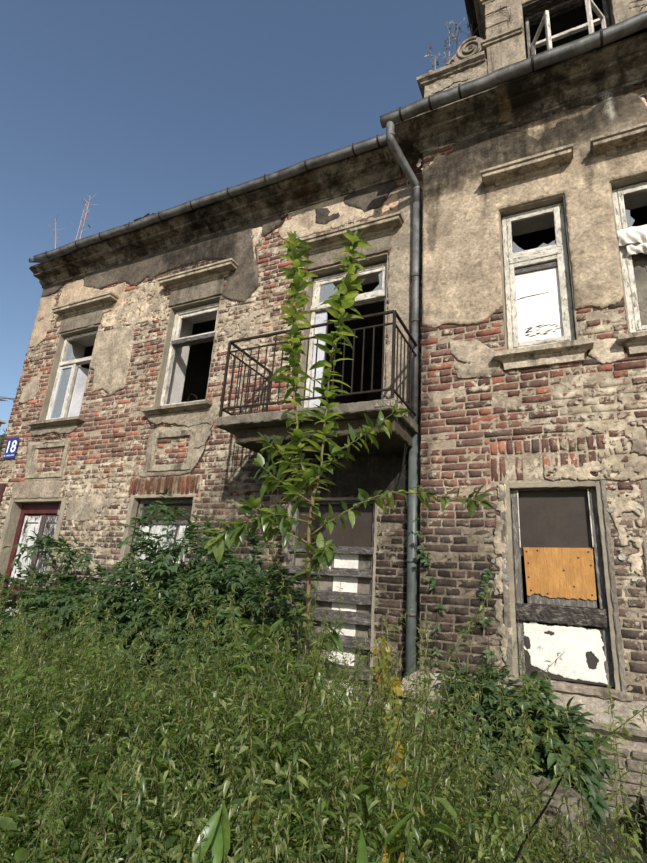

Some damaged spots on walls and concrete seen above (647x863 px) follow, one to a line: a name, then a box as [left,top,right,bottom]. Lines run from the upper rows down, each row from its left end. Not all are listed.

damp [425,90,627,196]
peeling [274,194,402,240]
peeling [251,227,262,262]
peeling [100,278,167,328]
crack [147,418,214,471]
peeling [605,484,645,581]
peeling [491,484,513,662]